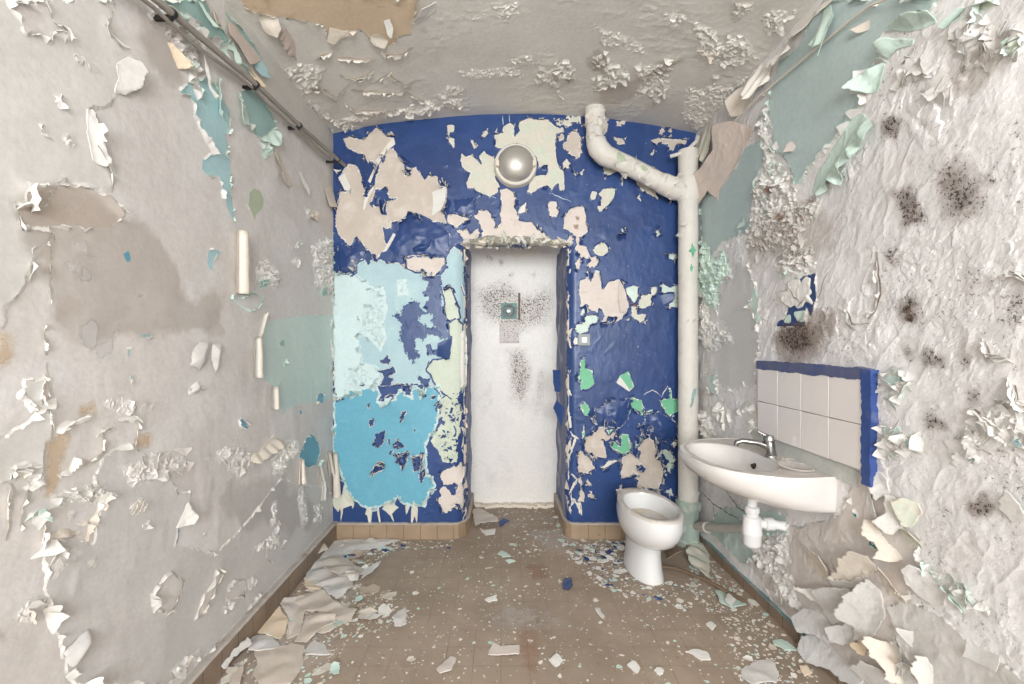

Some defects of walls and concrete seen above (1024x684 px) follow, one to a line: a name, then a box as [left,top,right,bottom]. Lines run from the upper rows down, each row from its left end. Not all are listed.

peeling [0,0,138,333]
water stain [881,113,902,144]
water stain [890,187,925,226]
water stain [933,145,996,228]
peeling [145,0,1024,521]
water stain [474,275,554,331]
water stain [777,323,814,358]
water stain [893,296,923,324]
peeling [0,374,57,486]
peeling [102,373,154,417]
peeling [12,417,332,684]
peeling [709,469,1024,684]